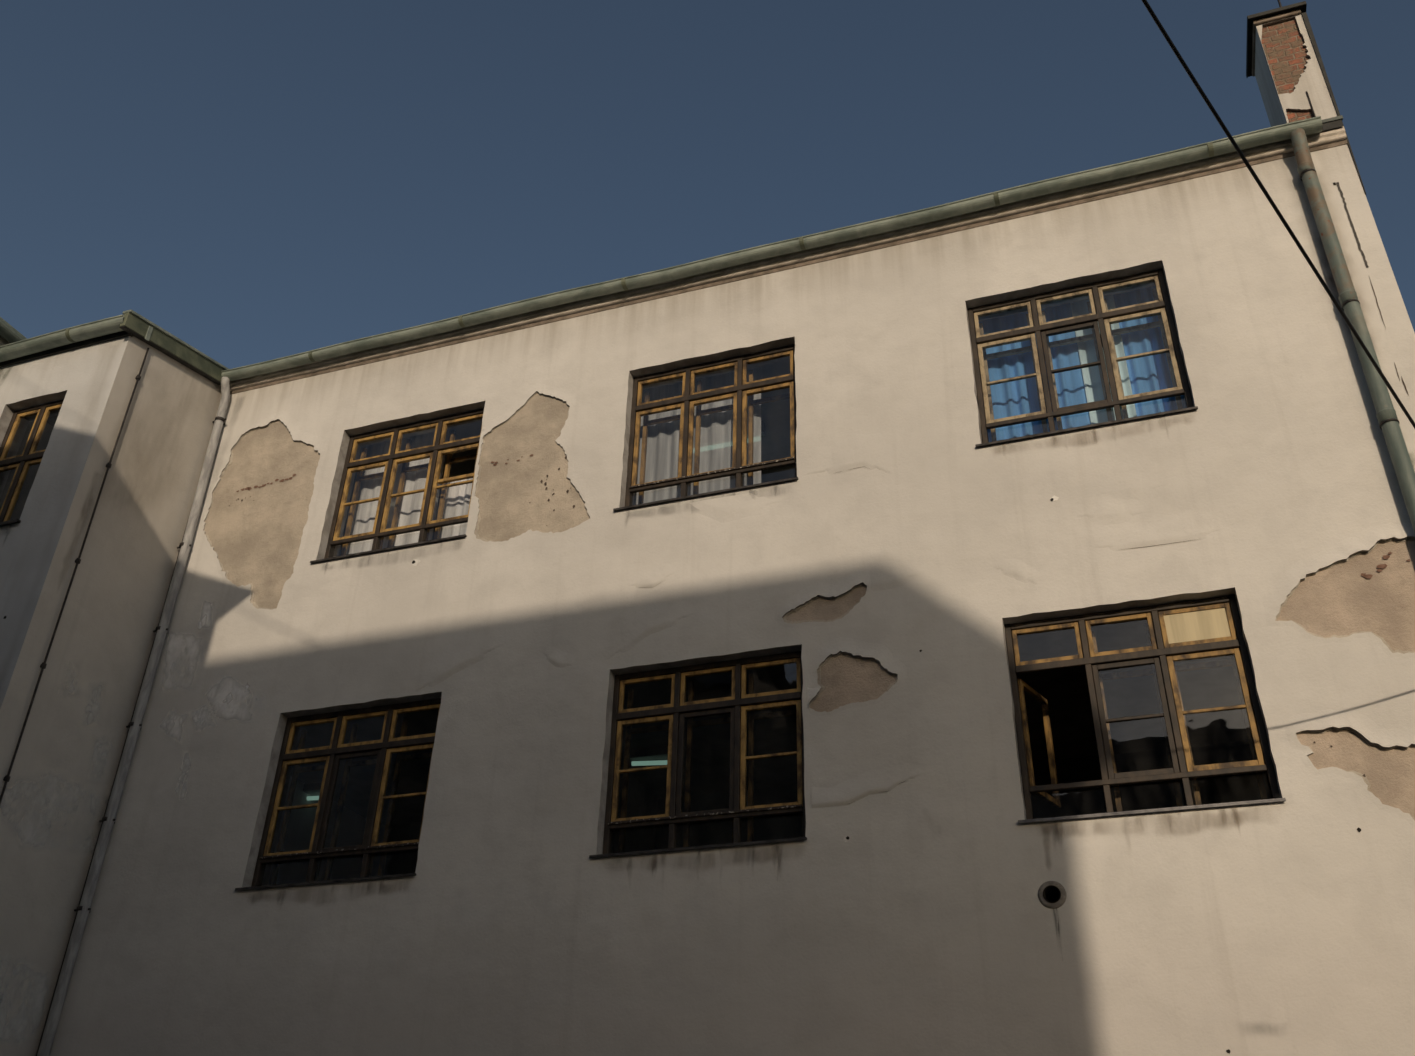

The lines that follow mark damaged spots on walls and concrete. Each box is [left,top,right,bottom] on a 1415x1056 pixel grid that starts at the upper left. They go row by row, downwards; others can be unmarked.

flaking render [1261,17,1314,123]
spalling [200,411,328,614]
spalling [470,383,595,545]
spalling [774,570,907,717]
spalling [1263,522,1415,659]
spalling [1281,709,1415,827]